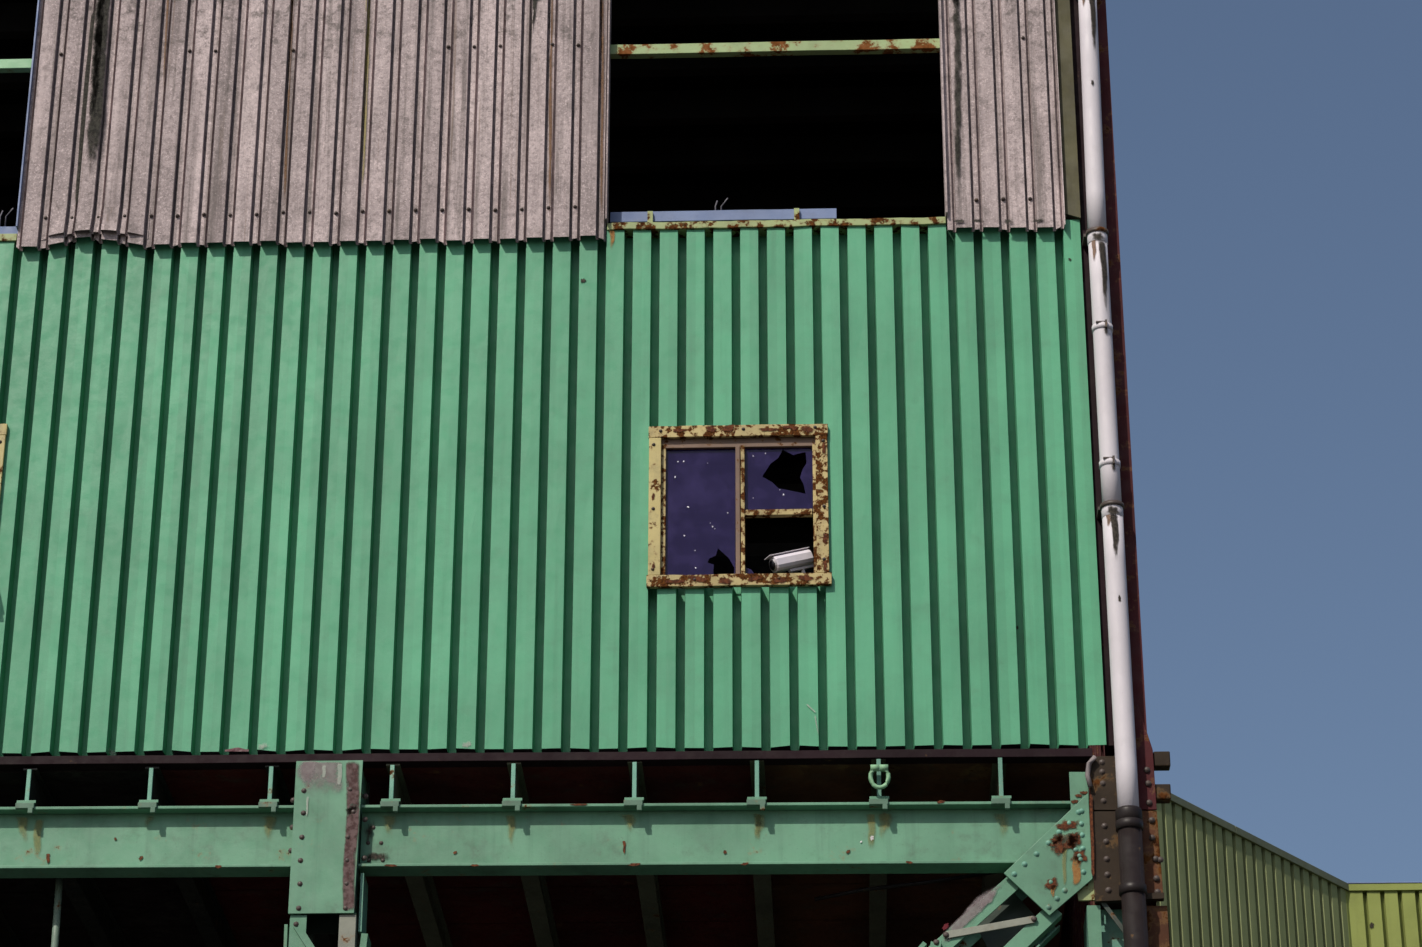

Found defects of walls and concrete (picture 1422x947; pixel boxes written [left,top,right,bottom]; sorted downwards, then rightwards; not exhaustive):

leakage [75,0,110,202]
corrosion [760,425,826,453]
corrosion [665,560,827,584]
corrosion [1045,791,1095,896]